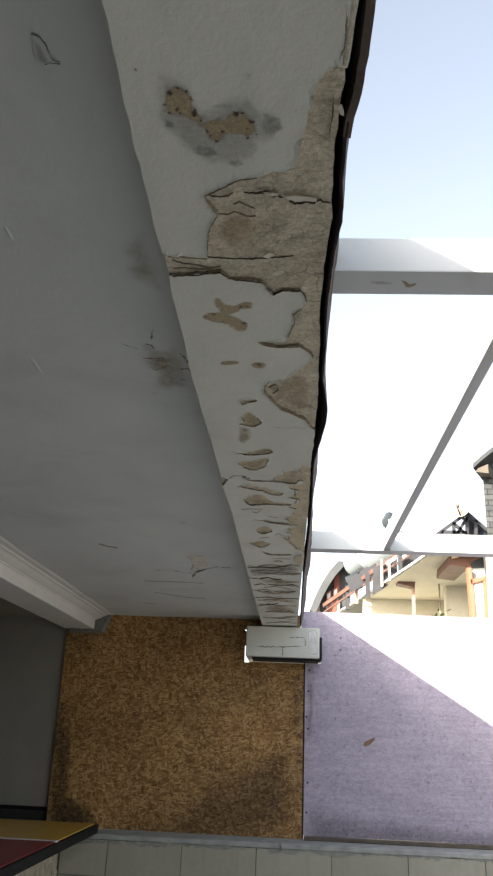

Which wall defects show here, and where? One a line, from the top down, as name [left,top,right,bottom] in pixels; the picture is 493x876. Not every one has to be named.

flaking render [164,67,345,429]
peeling [221,448,311,556]